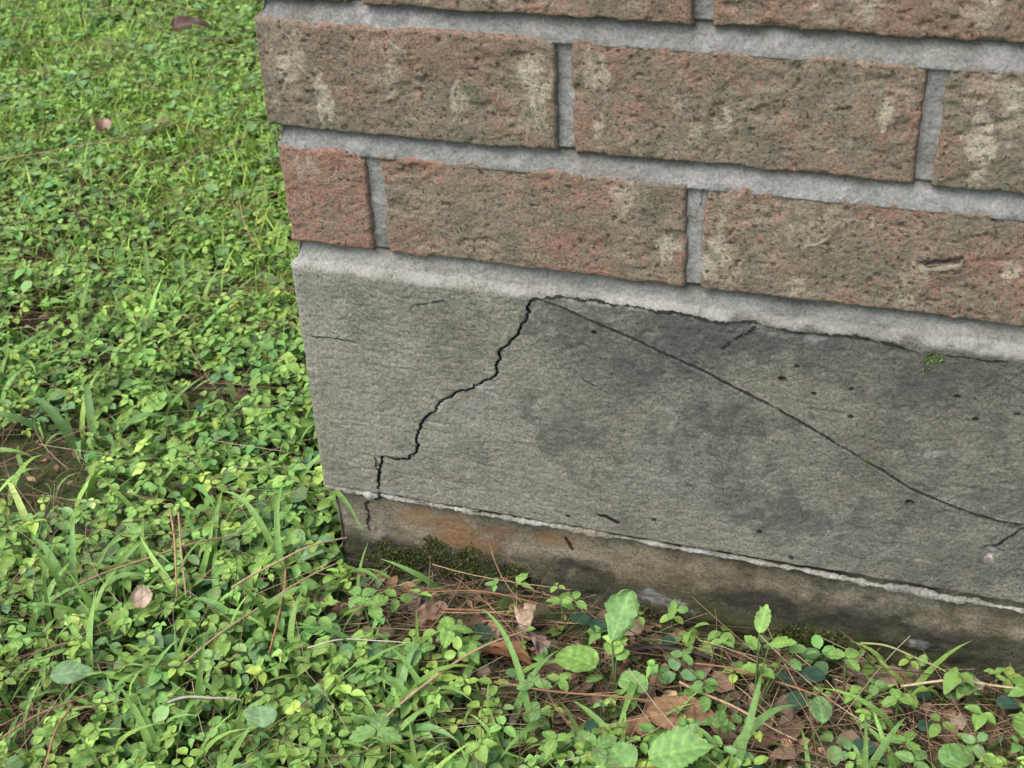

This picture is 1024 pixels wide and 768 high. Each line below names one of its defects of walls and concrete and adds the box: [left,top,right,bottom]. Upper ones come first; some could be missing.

crack [364,294,1023,531]